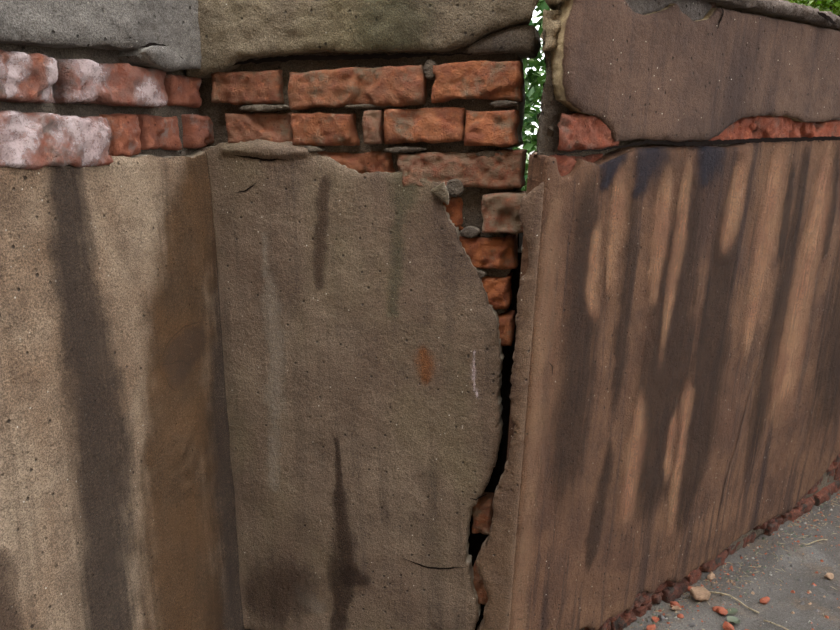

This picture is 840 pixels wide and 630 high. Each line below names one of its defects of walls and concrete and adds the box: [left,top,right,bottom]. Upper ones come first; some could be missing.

leakage [0,52,30,99]
leakage [136,79,167,108]
leakage [0,111,40,168]
flaking render [550,113,619,176]
flaking render [709,116,840,141]
flaking render [0,45,527,346]
leakage [42,57,134,630]
crack [403,252,522,569]
leakage [330,438,369,630]
flaking render [472,492,494,535]
flaking render [473,560,488,605]
crack [475,604,485,630]